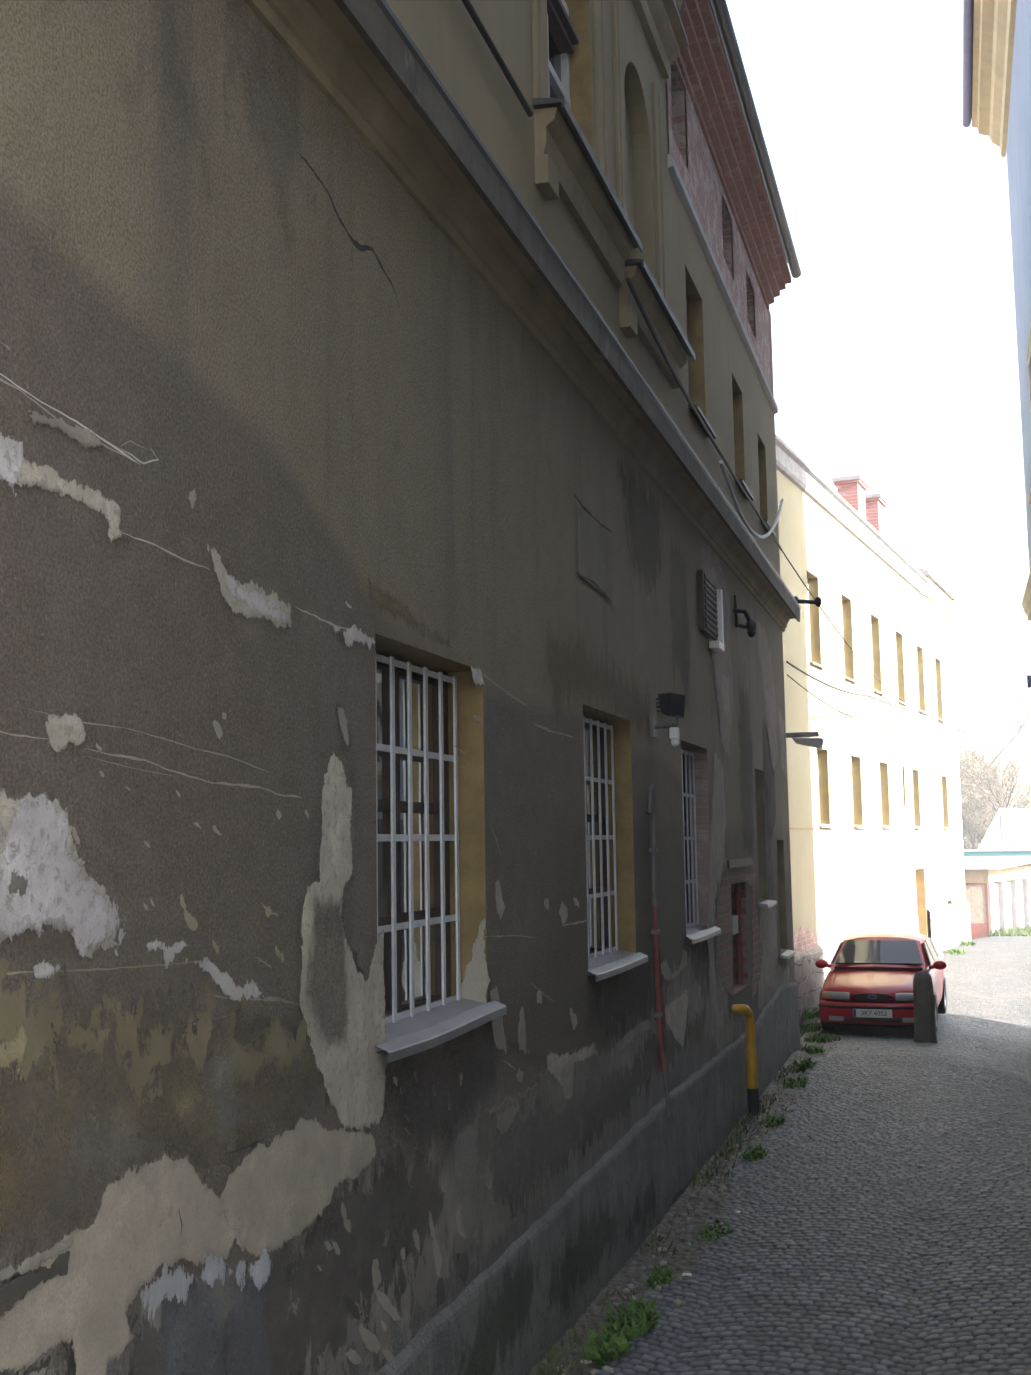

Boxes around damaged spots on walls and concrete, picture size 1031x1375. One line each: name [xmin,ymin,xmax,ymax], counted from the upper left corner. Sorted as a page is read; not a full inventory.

crack [294,101,399,304]
spalling [0,432,24,497]
peeling [28,409,103,449]
peeling [108,521,122,543]
peeling [207,543,375,651]
peeling [471,665,528,707]
spalling [616,540,917,1053]
peeling [146,895,264,1002]
peeling [299,707,387,1131]
peeling [0,1019,43,1081]
peeling [342,879,598,1365]
spalling [0,1236,73,1281]